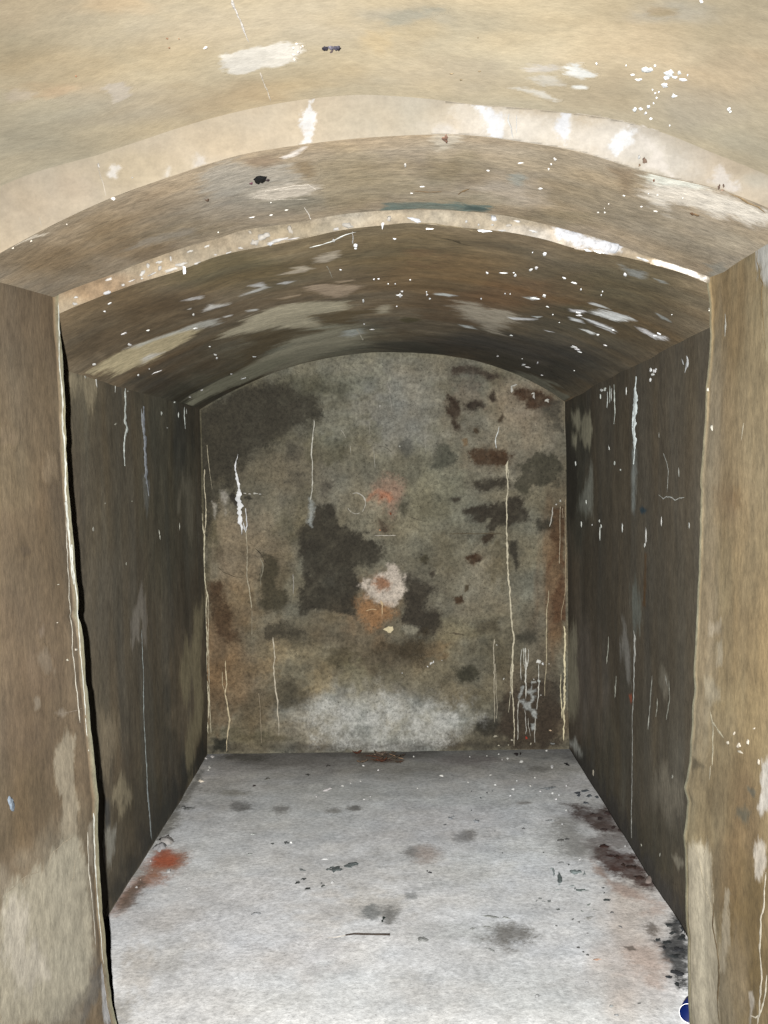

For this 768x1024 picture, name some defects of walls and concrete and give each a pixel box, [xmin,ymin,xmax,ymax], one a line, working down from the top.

rust [350,572,440,673]
leakage [77,371,687,1024]
rust [127,845,196,891]